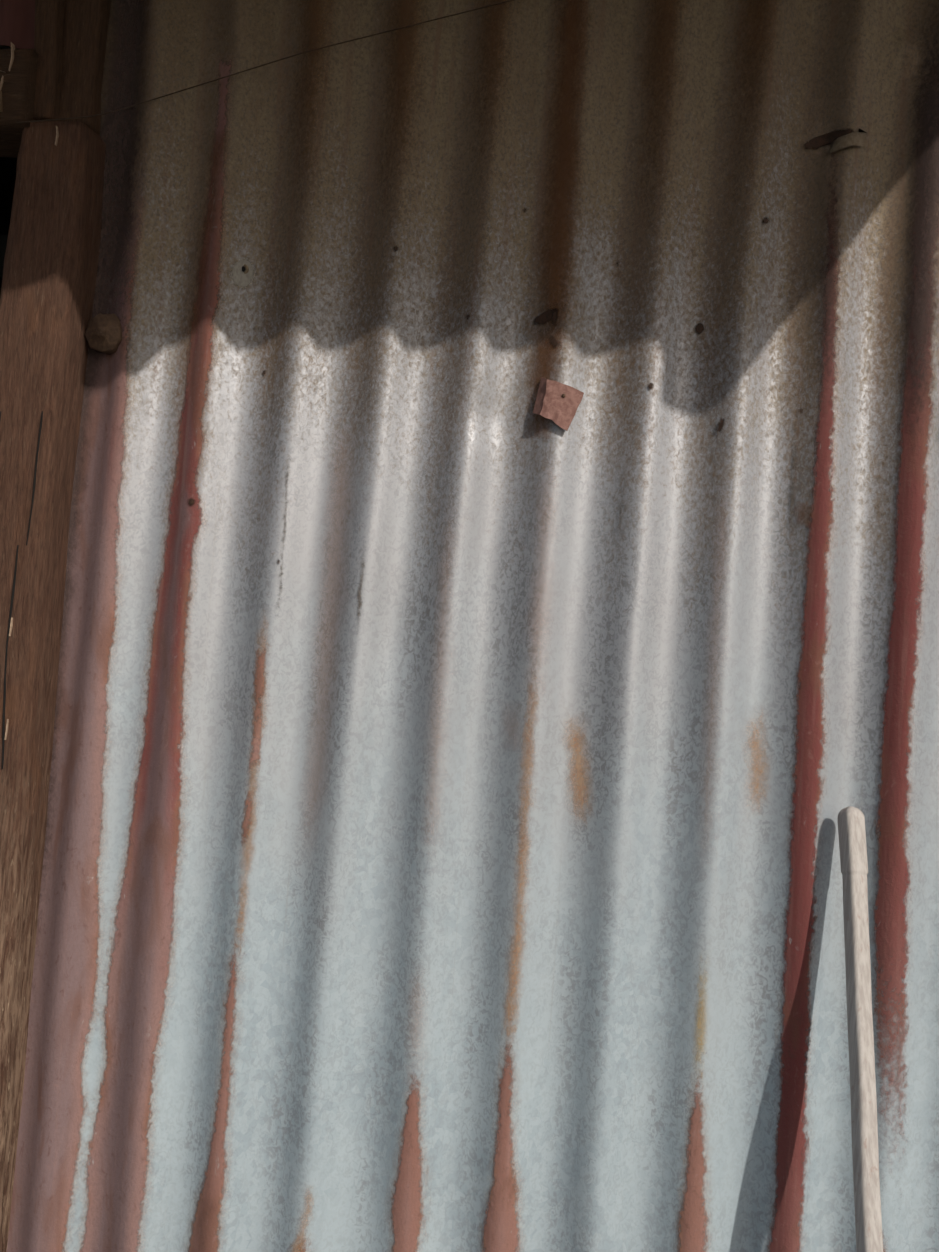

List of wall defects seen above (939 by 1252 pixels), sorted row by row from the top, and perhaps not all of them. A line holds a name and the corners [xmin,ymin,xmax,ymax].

corrosion [534,309,559,426]
corrosion [7,60,236,1252]
corrosion [392,1082,423,1252]
corrosion [483,706,534,1252]
corrosion [678,1085,708,1252]
corrosion [768,193,840,1252]
corrosion [874,272,934,1099]